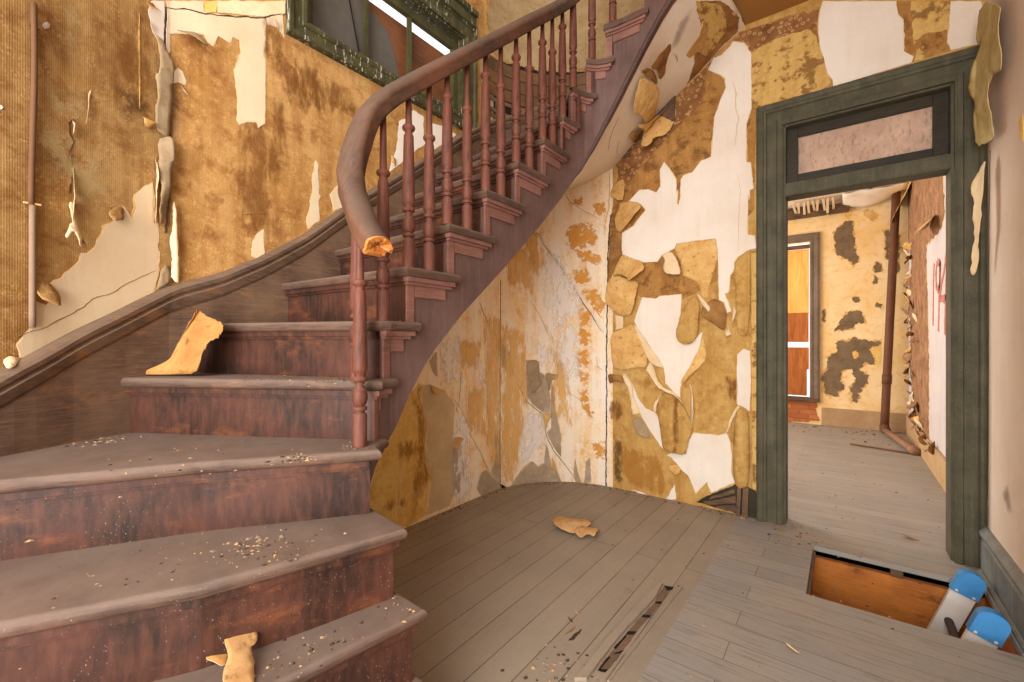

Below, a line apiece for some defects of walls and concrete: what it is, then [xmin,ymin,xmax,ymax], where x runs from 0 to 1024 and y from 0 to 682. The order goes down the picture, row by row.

flaking render [817,0,914,86]
crack [17,271,154,337]
flaking render [3,0,286,368]
flaking render [306,160,342,229]
flaking render [423,352,464,514]
crack [455,280,575,489]
crack [531,118,619,486]
flaking render [605,21,756,500]